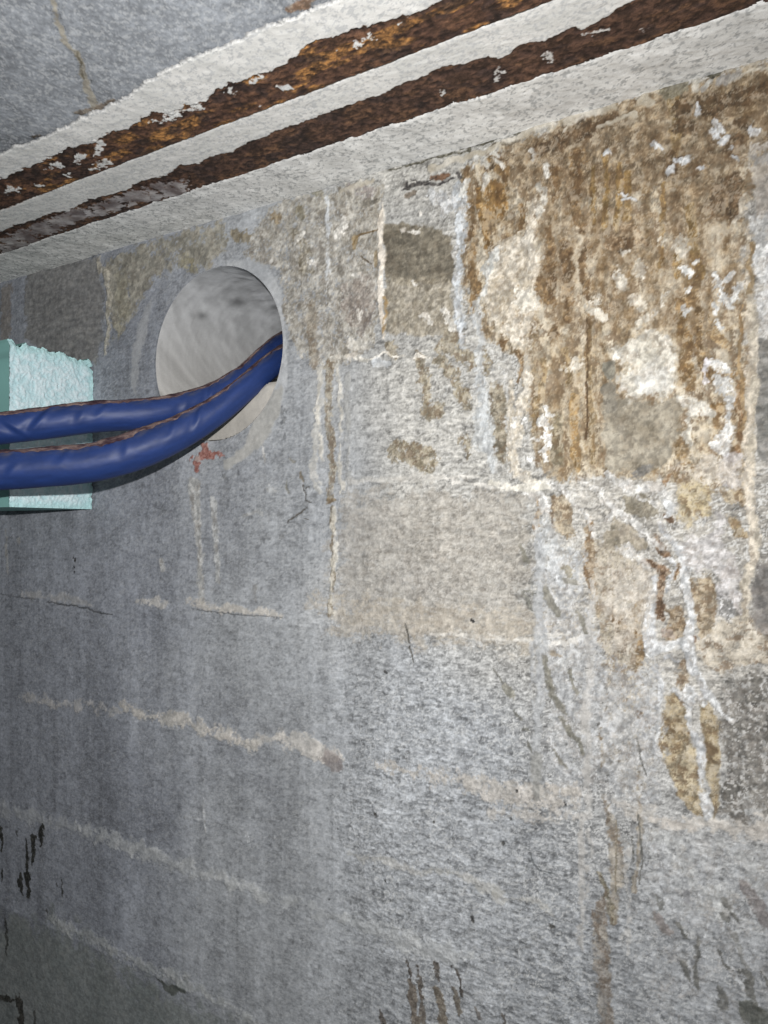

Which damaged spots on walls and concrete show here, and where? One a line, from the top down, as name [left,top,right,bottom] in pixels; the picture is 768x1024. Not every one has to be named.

rust [284,0,317,14]
rust [72,98,117,116]
peeling [0,0,634,254]
water stain [648,139,707,177]
spalling [656,66,768,102]
water stain [692,99,768,171]
spalling [748,160,768,215]
spalling [755,336,768,464]
water stain [23,146,768,824]
water stain [0,822,251,1024]